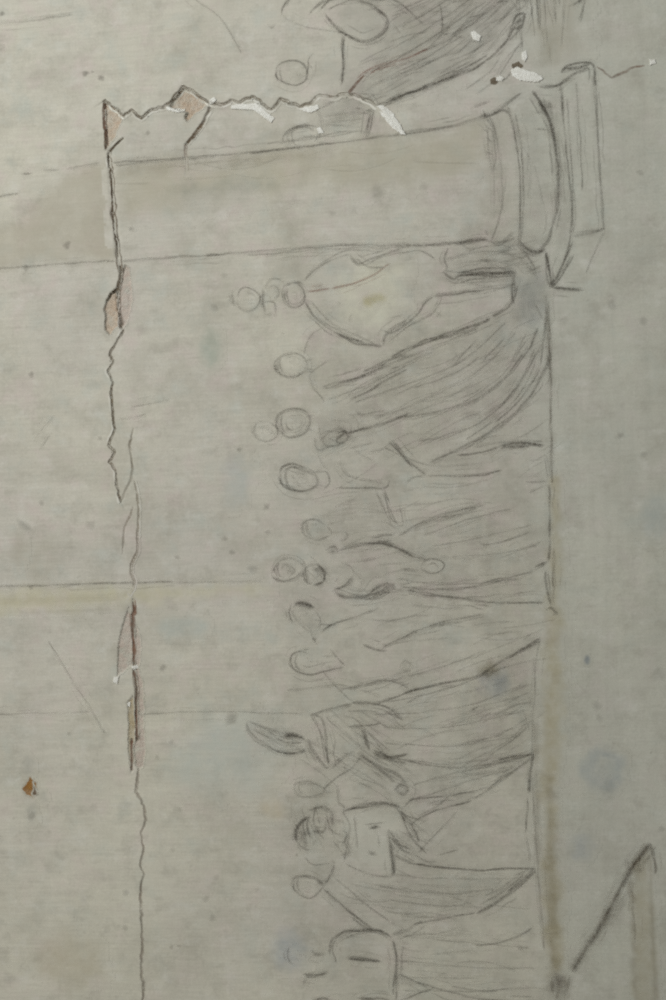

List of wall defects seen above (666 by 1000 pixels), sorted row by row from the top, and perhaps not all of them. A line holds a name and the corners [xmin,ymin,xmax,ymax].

flaking render [490,50,543,85]
flaking render [103,102,124,150]
flaking render [169,86,208,123]
flaking render [102,264,134,335]
crack [102,75,406,750]
flaking render [116,605,147,770]
rust [18,752,51,829]